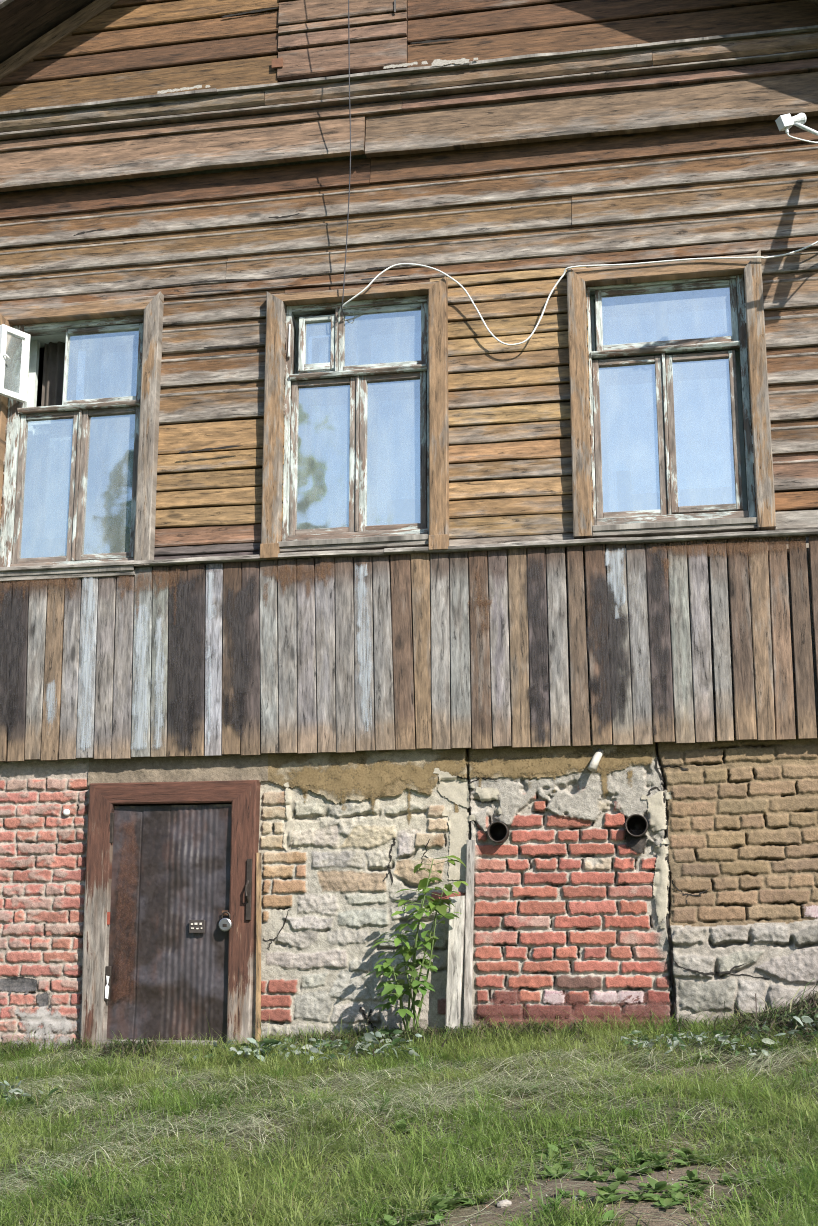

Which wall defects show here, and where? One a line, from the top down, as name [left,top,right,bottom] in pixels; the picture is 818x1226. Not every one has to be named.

crack [383,838,431,885]
peeling [641,790,672,929]